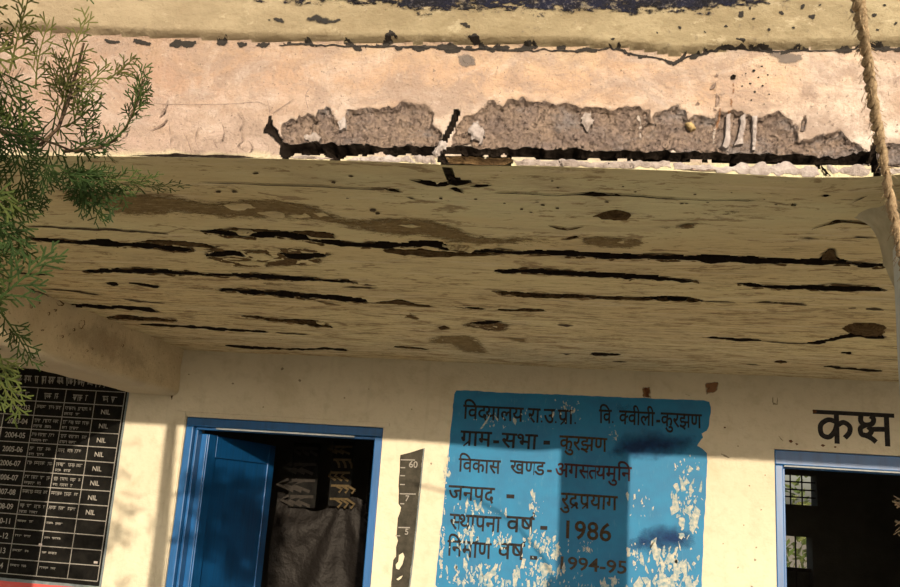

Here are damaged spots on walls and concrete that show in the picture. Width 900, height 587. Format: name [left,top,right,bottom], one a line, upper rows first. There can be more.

crack [119,88,900,201]
spalling [281,96,900,177]
flaking render [202,245,332,268]
peeling [87,191,550,248]
peeling [593,210,631,221]
peeling [582,236,647,249]
peeling [429,308,544,354]
peeling [439,455,703,587]